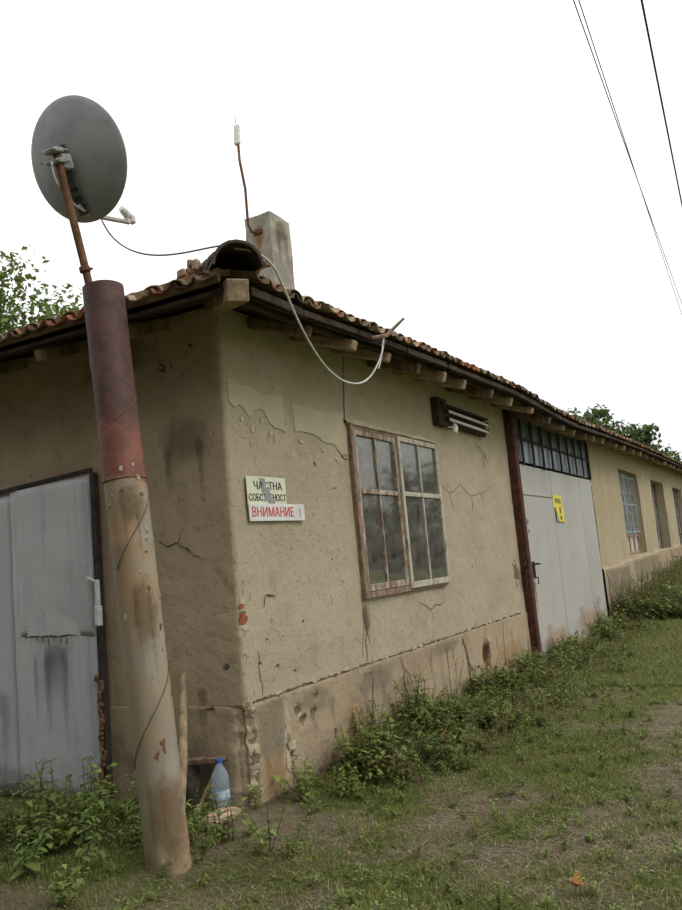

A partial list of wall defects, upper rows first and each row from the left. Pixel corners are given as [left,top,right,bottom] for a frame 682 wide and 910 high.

crack [157,530,202,559]
flaking render [238,597,248,631]
spalling [238,701,264,805]
spalling [282,691,319,771]
crack [253,601,521,789]